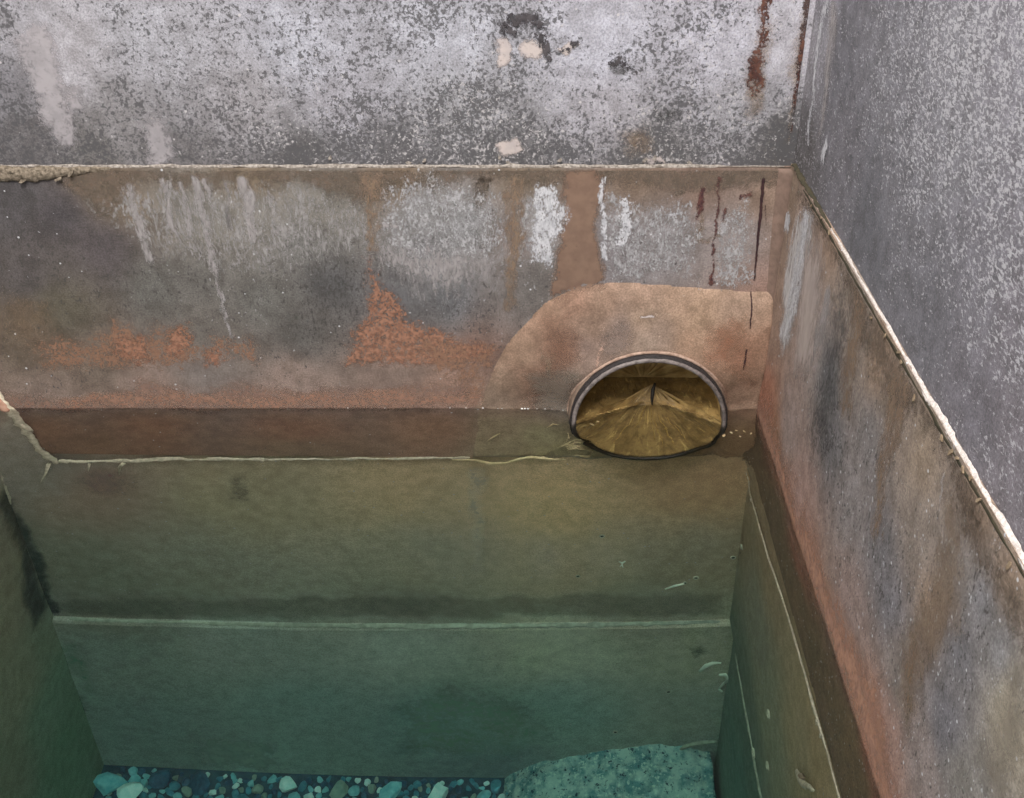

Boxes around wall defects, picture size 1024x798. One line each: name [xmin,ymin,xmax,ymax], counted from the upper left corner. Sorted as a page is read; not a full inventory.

spalling [496,12,579,67]
spalling [608,55,639,75]
rust [746,0,772,97]
rust [788,0,810,132]
water stain [63,114,578,335]
rust [695,177,727,286]
rust [28,319,261,371]
rust [340,255,500,400]